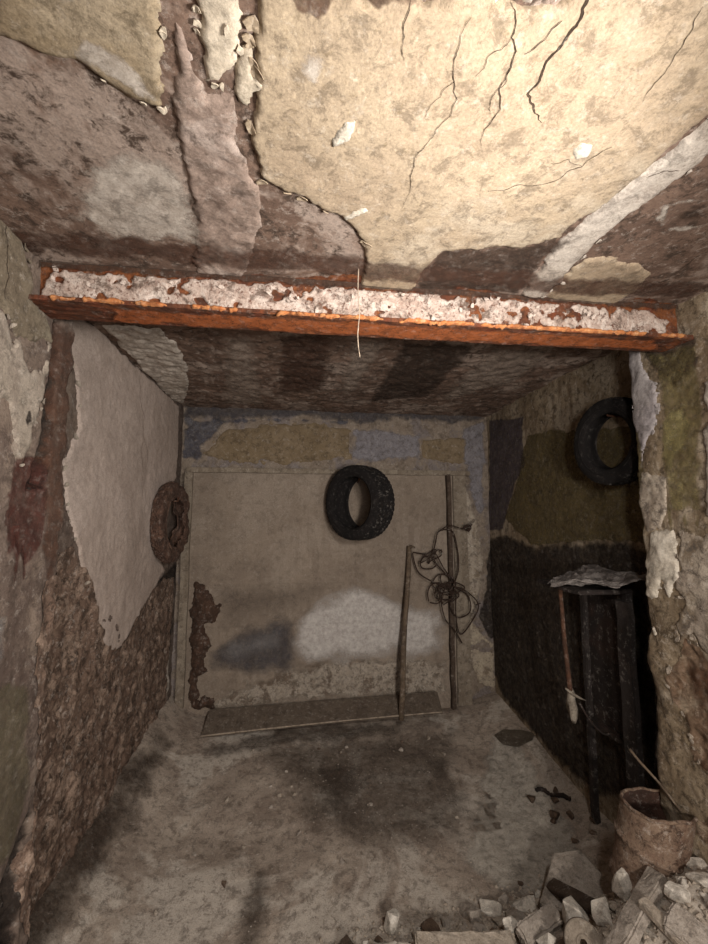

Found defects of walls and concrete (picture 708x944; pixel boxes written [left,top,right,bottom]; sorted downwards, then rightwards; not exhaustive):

crack [404,0,589,203]
crack [643,8,702,101]
flaking render [0,0,708,467]
water stain [184,336,481,423]
rust [114,309,656,350]
water stain [446,351,544,399]
rust [5,457,48,576]
peeling [466,351,670,616]
spalling [0,320,353,944]
rust [188,581,222,710]
spalling [214,659,445,707]